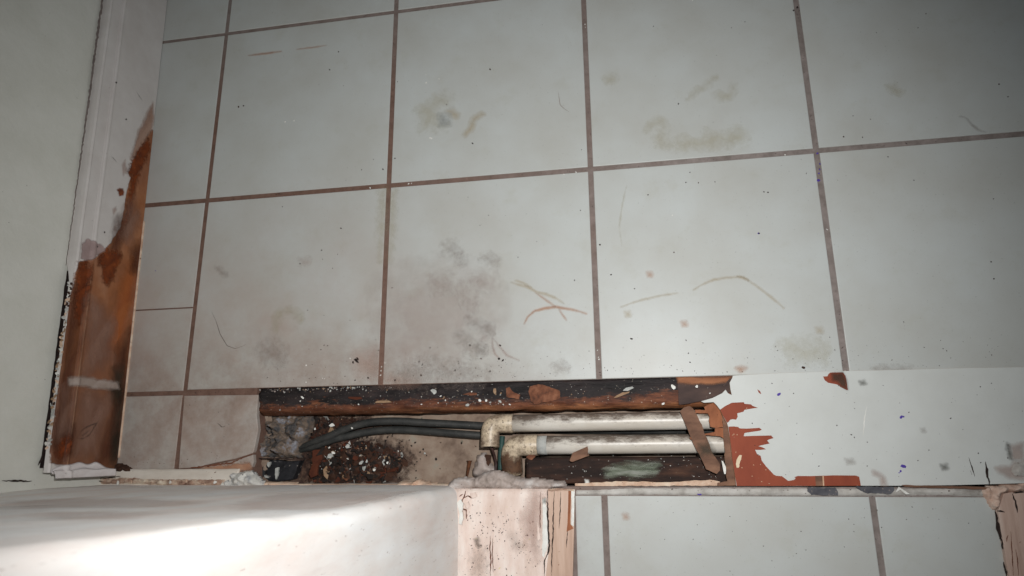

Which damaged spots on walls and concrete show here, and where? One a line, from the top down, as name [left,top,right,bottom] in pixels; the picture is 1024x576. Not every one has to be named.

peeling [45,130,225,485]
peeling [824,372,848,390]
peeling [720,402,909,496]